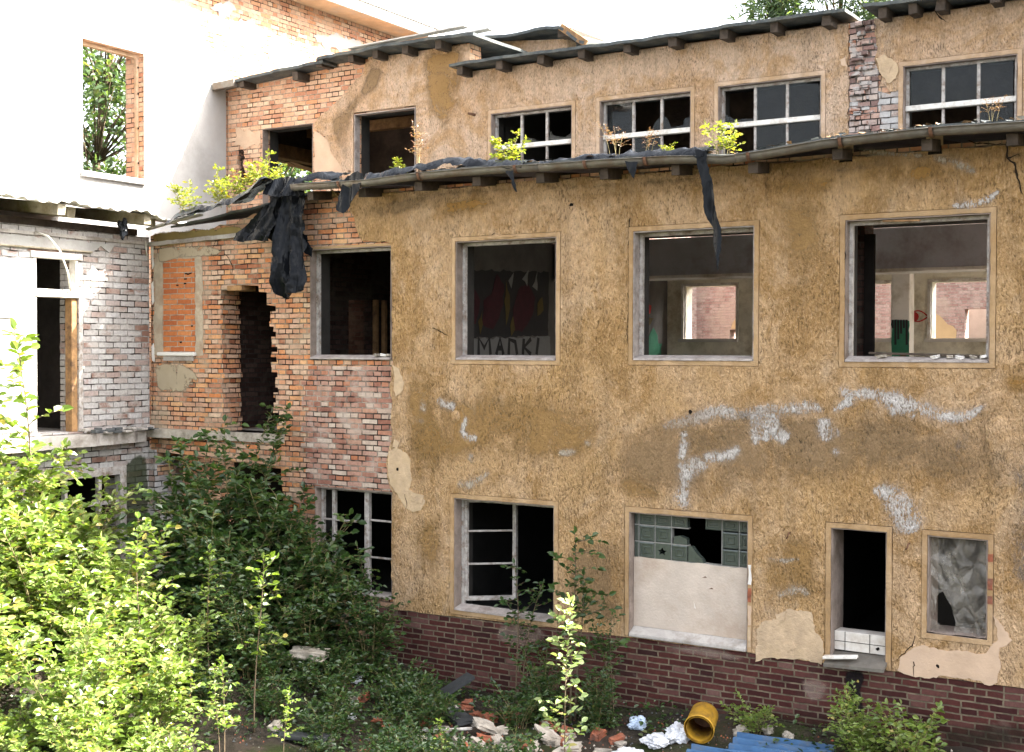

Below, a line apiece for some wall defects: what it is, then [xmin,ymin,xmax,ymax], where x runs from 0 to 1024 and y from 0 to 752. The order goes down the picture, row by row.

flaking render [840,20,899,135]
flaking render [314,131,353,176]
flaking render [388,439,425,512]
flaking render [747,565,824,665]
flaking render [897,579,1012,686]